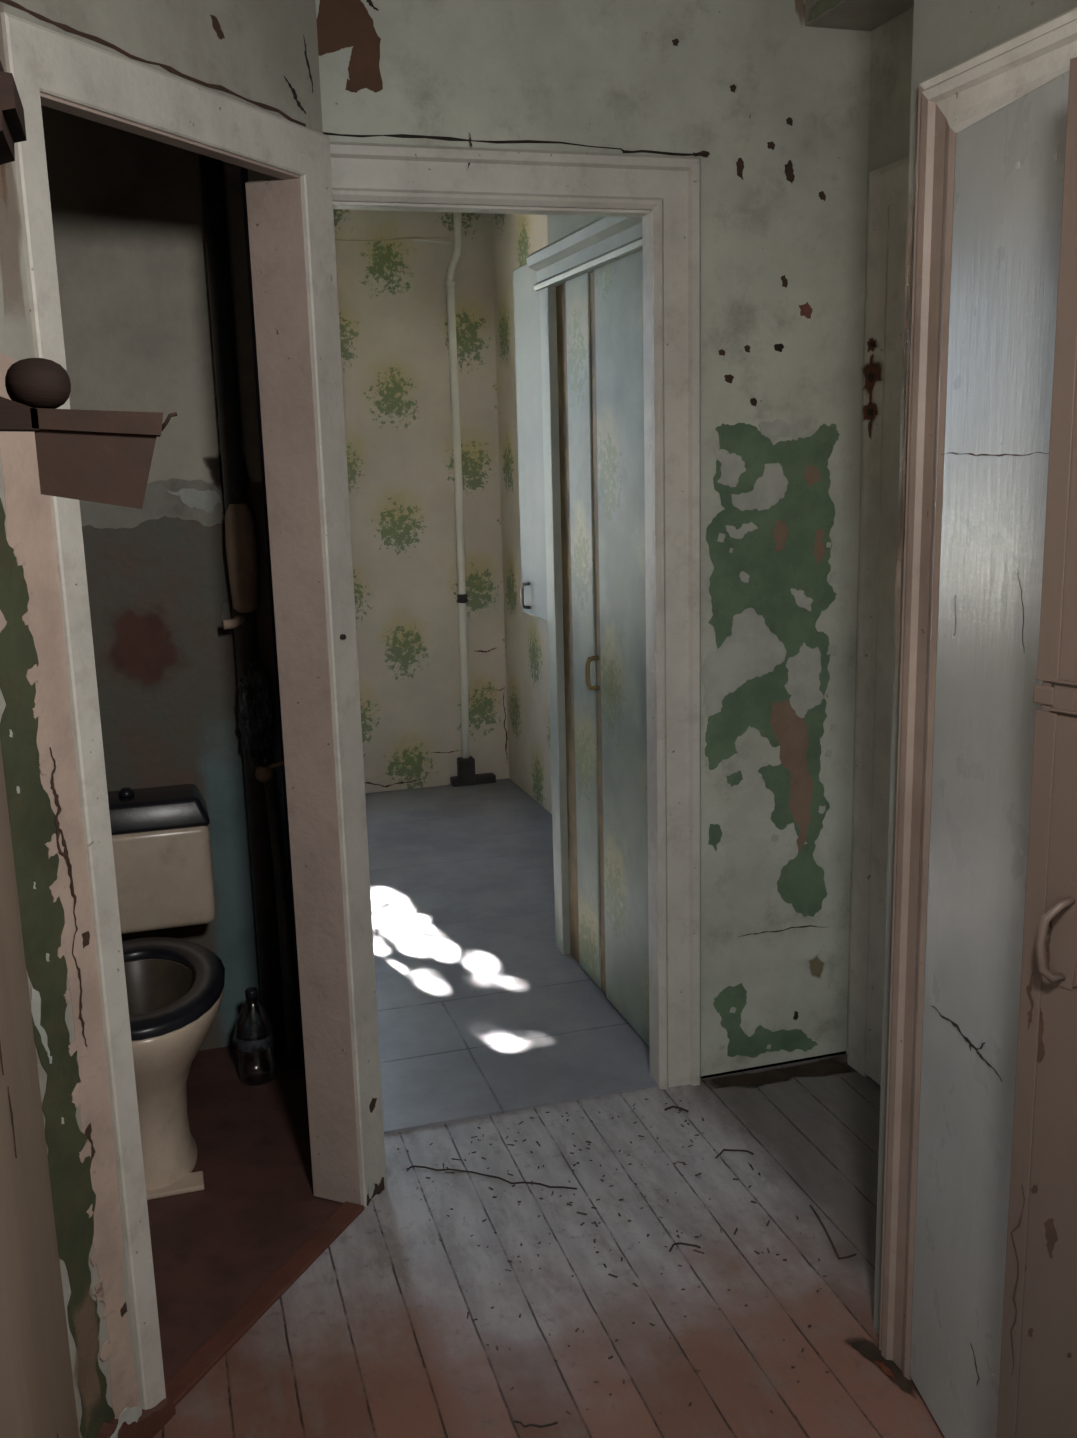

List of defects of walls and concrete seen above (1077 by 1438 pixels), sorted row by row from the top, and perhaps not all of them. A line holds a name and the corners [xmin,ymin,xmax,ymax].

peeling [337,48,351,80]
crack [0,0,707,171]
peeling [736,158,744,180]
peeling [785,160,795,183]
peeling [798,302,813,319]
peeling [0,353,18,400]
corrosion [862,338,882,438]
peeling [701,398,840,917]
peeling [0,431,176,1438]
peeling [713,983,818,1058]
crack [931,1006,1002,1082]
crack [1026,973,1034,1029]